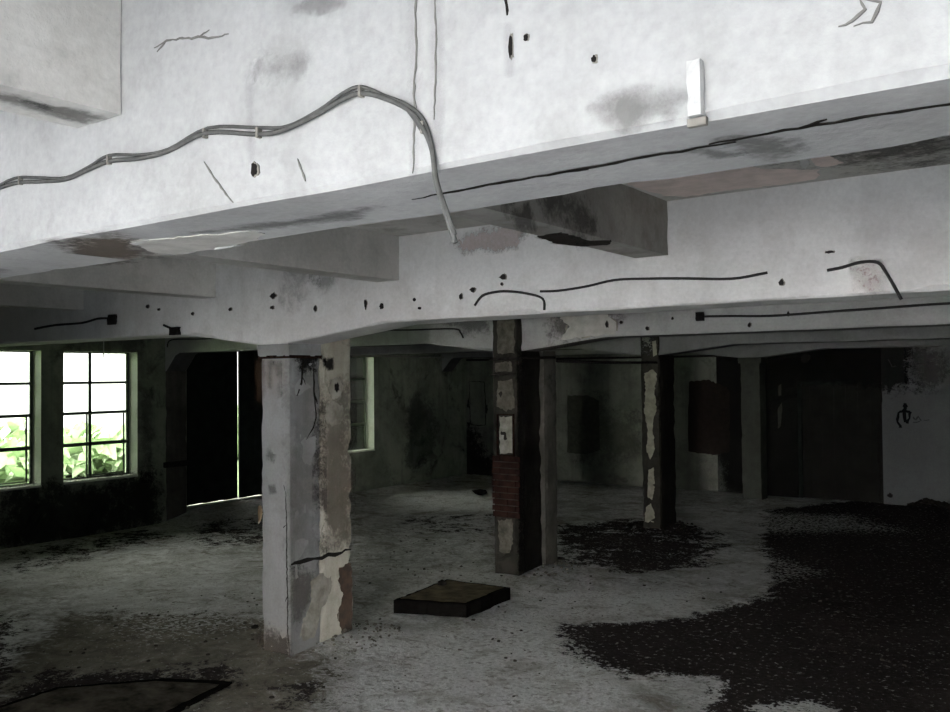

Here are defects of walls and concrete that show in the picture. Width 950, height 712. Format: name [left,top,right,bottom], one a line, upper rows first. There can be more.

crack [154,30,228,52]
crack [838,0,882,27]
crack [412,0,437,173]
crack [412,103,950,200]
peeling [628,156,844,197]
spalling [535,232,612,247]
water stain [766,347,950,398]
flaking render [492,319,520,554]
peeling [644,370,657,522]
crack [283,485,351,653]
peeling [299,563,354,641]